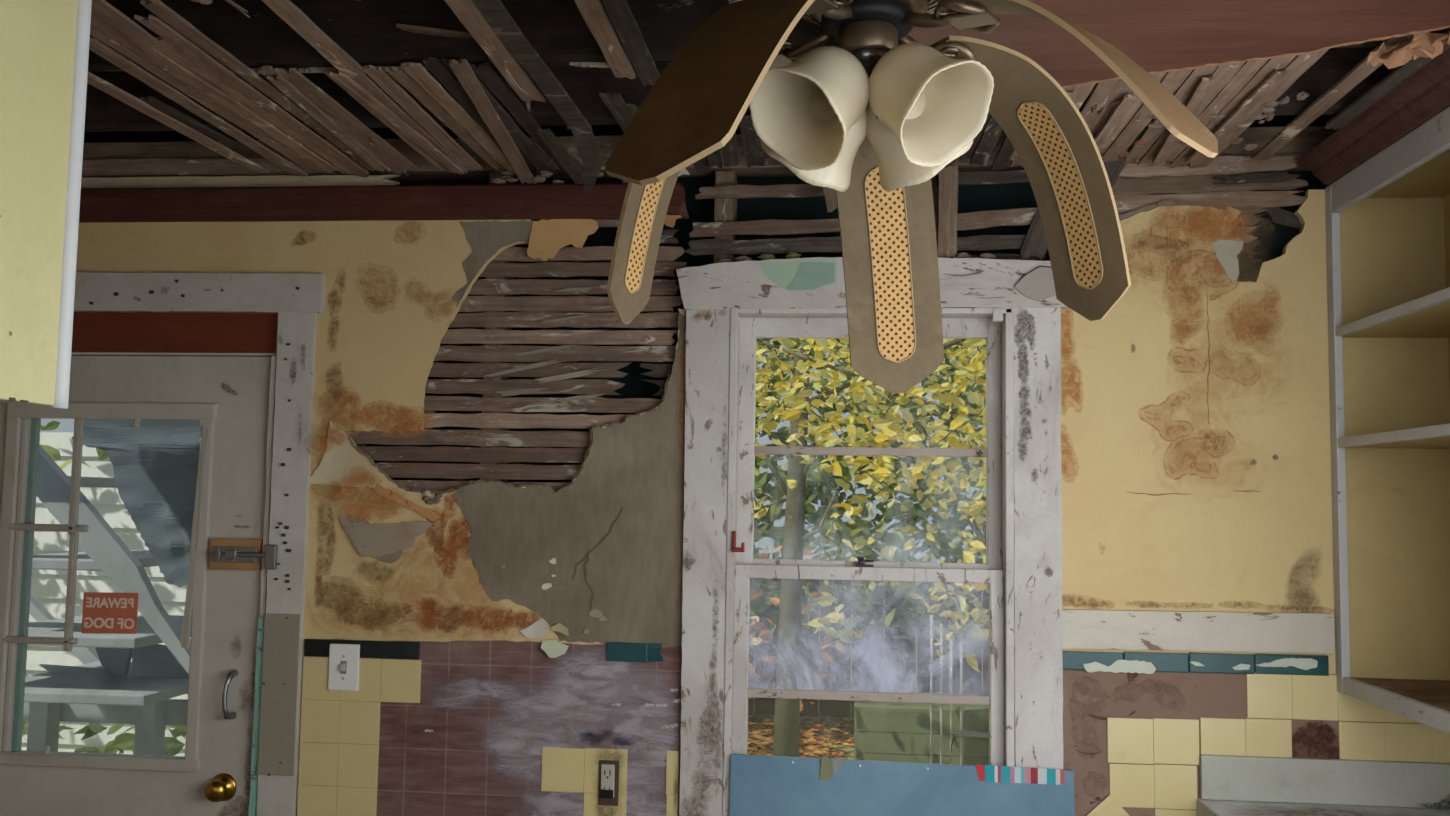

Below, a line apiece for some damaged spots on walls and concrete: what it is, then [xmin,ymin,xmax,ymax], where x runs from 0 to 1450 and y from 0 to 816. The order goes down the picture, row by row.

peeling [1366,32,1450,69]
water stain [1126,202,1244,365]
flaking render [1112,153,1309,282]
water stain [316,472,412,626]
spalling [309,215,694,816]
crack [572,507,623,610]
peeling [1063,658,1336,816]
peeling [1289,719,1363,759]